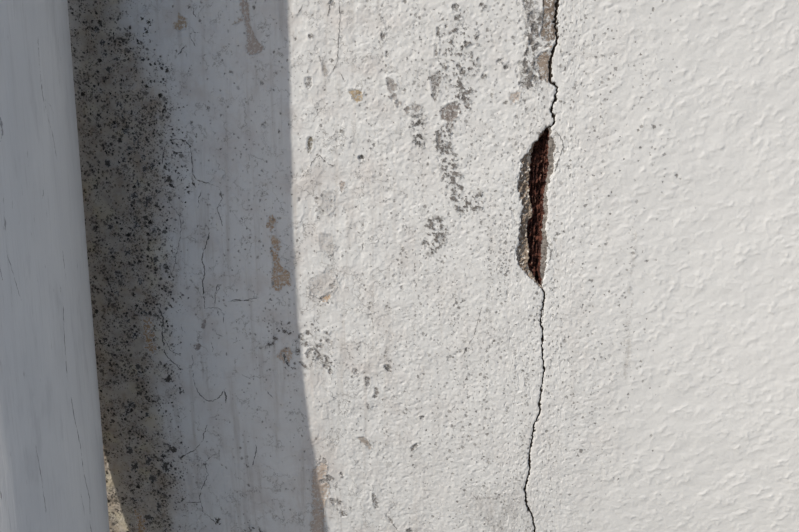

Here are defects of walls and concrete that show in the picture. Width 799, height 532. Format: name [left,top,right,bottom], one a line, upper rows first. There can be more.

peeling [232,0,264,55]
crack [548,0,564,172]
damp [67,0,225,532]
peeling [266,214,292,293]
spalling [516,126,556,289]
crack [524,284,545,532]
peeling [309,458,347,532]